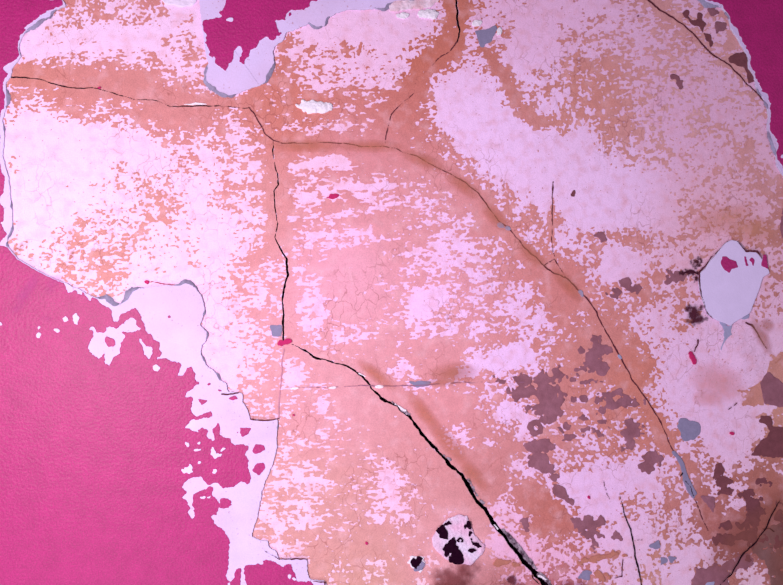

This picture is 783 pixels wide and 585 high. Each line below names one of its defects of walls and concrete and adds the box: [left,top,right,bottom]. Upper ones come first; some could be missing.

crack [647,0,764,102]
leakage [679,257,702,281]
crack [695,241,761,319]
peeling [721,256,738,273]
peeling [88,318,141,366]
peeling [146,331,200,376]
crack [11,76,708,585]
leakage [685,305,708,325]
peeling [389,563,481,585]
leakage [436,521,482,585]
peeling [467,491,526,585]
flaking render [514,562,541,585]